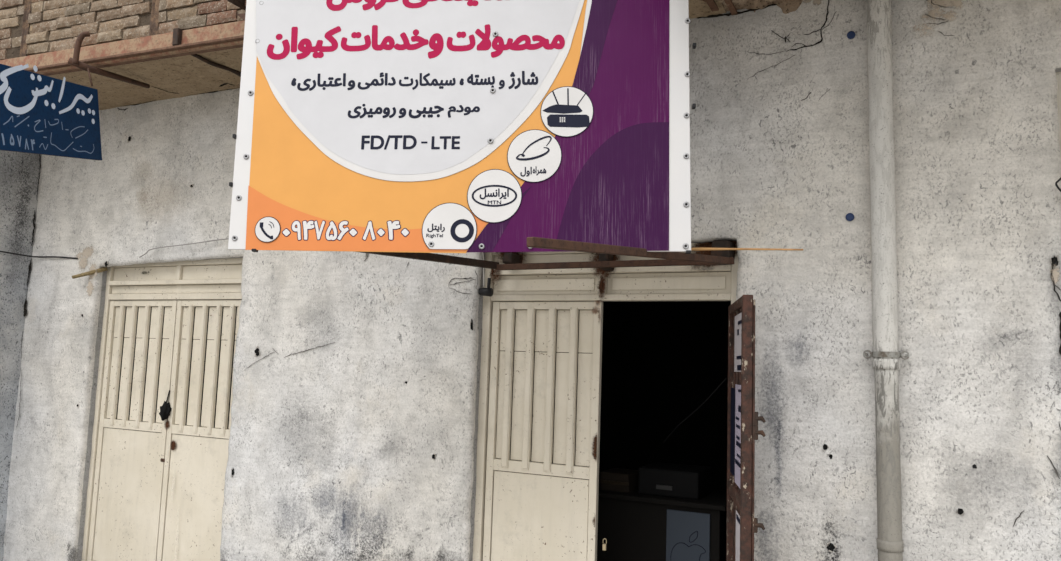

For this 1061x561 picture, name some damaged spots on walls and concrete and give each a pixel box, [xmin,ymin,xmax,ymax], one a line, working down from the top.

crack [697,0,837,78]
corrosion [692,242,715,270]